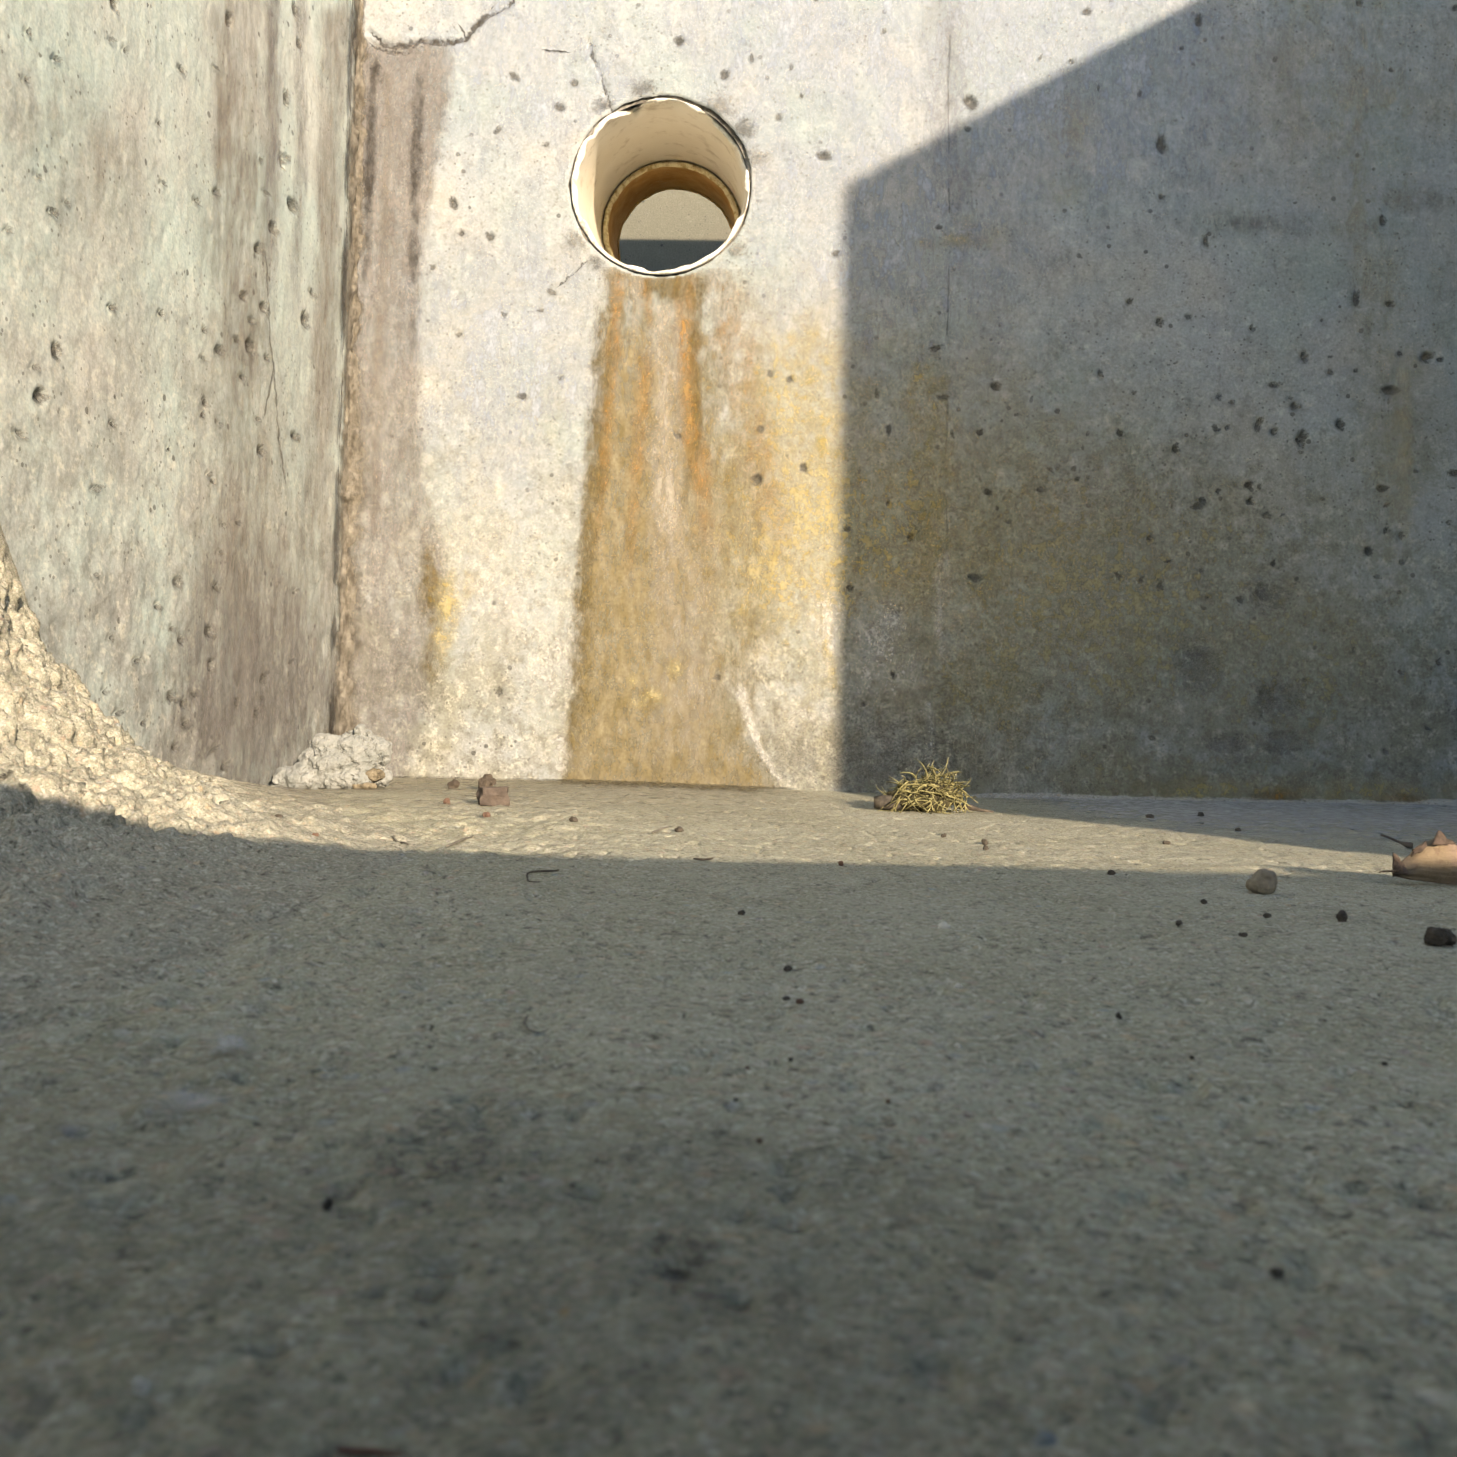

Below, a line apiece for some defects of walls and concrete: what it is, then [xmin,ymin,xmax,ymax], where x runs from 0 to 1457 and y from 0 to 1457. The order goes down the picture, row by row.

water stain [269,0,278,86]
crack [332,0,515,648]
corrosion [560,188,765,791]
water stain [197,605,310,781]
crack [329,684,337,734]